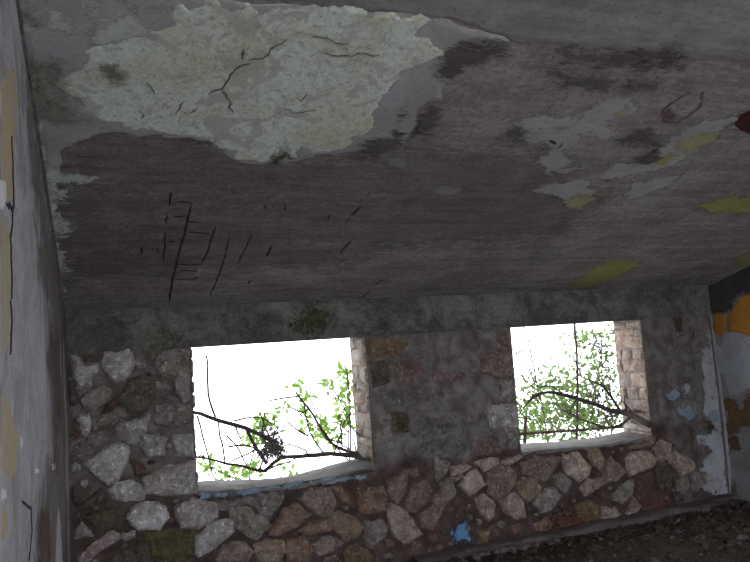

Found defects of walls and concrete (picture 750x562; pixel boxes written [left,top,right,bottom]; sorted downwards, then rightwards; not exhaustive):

crack [175,39,286,114]
crack [313,35,380,57]
water stain [547,71,657,92]
water stain [555,44,688,73]
peeling [19,0,511,239]
water stain [614,127,665,164]
crack [141,193,251,303]
peeling [568,259,642,289]
peeling [666,294,750,495]